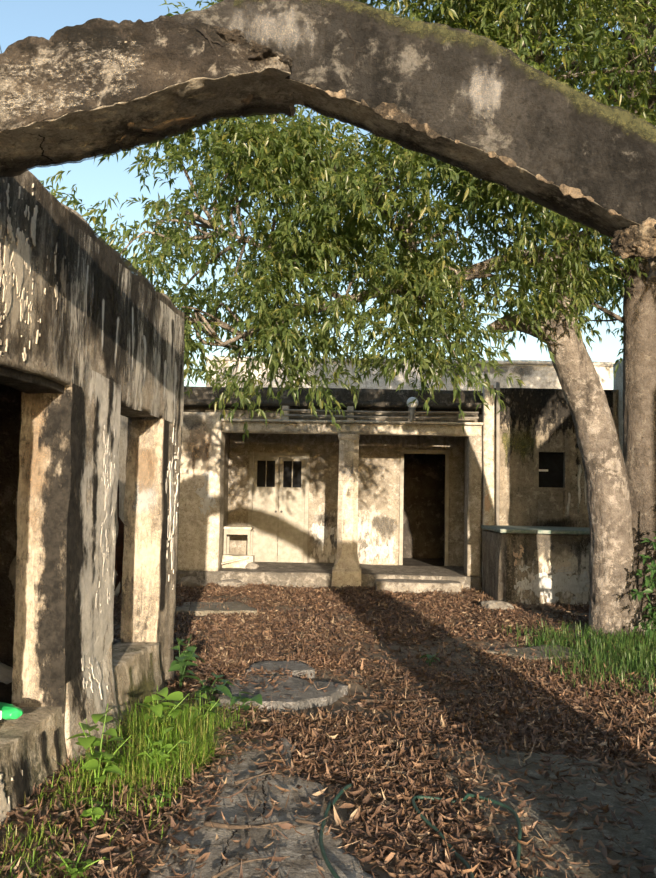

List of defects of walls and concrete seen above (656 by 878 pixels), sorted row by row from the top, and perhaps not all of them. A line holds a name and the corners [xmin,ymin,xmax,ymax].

spalling [310,84,346,99]
spalling [361,99,441,139]
leakage [304,103,615,238]
spalling [535,174,594,203]
peeling [0,180,41,361]
leakage [0,104,291,730]
leakage [447,364,587,512]
leakage [604,390,613,417]
leakage [357,508,396,564]
peeling [513,544,590,603]
peeling [0,770,23,825]
crack [198,768,321,878]